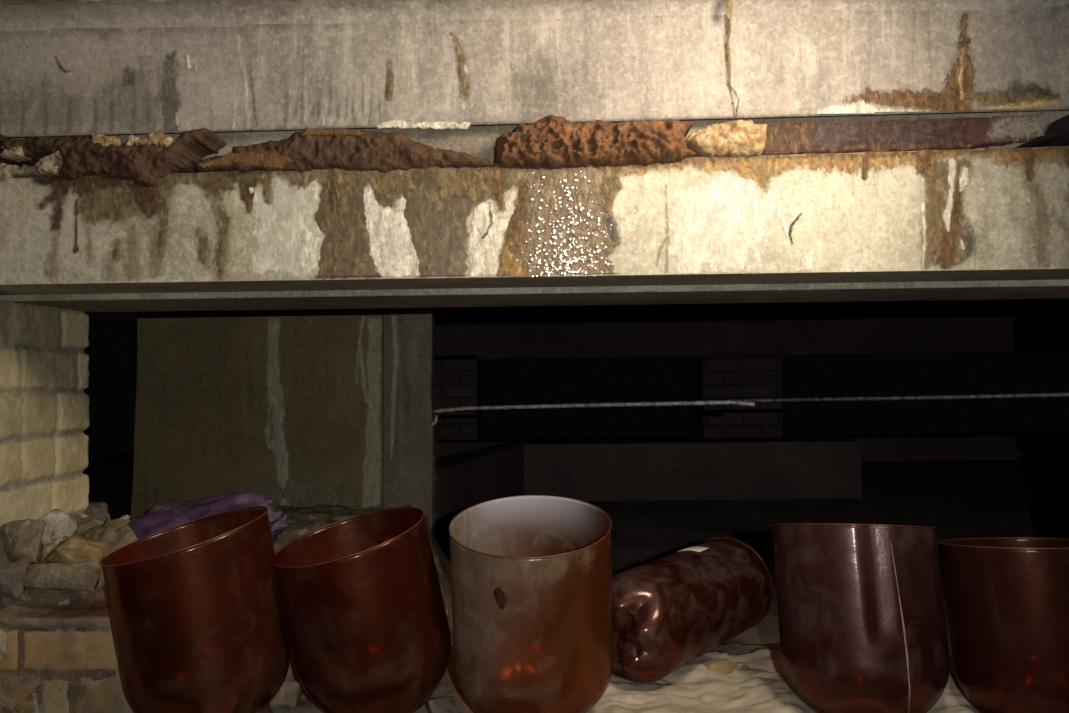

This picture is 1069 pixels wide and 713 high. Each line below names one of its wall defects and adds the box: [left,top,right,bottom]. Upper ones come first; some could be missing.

crack [724,0,740,117]
rust [0,14,1069,280]
damp [251,163,623,279]